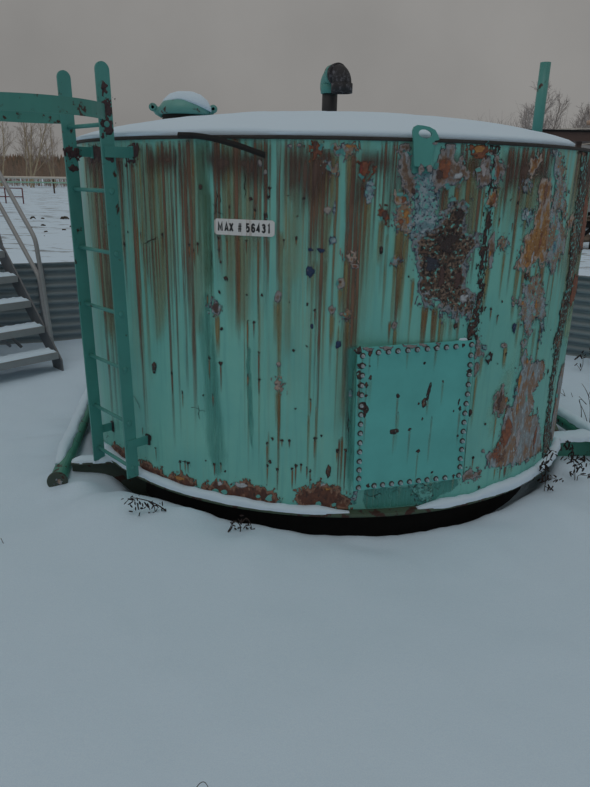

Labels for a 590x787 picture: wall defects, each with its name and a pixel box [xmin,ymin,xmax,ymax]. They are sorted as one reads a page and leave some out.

rust [63,81,406,378]
peeling [353,142,588,489]
rust [111,441,125,458]
rust [138,457,283,503]
rust [293,439,353,510]